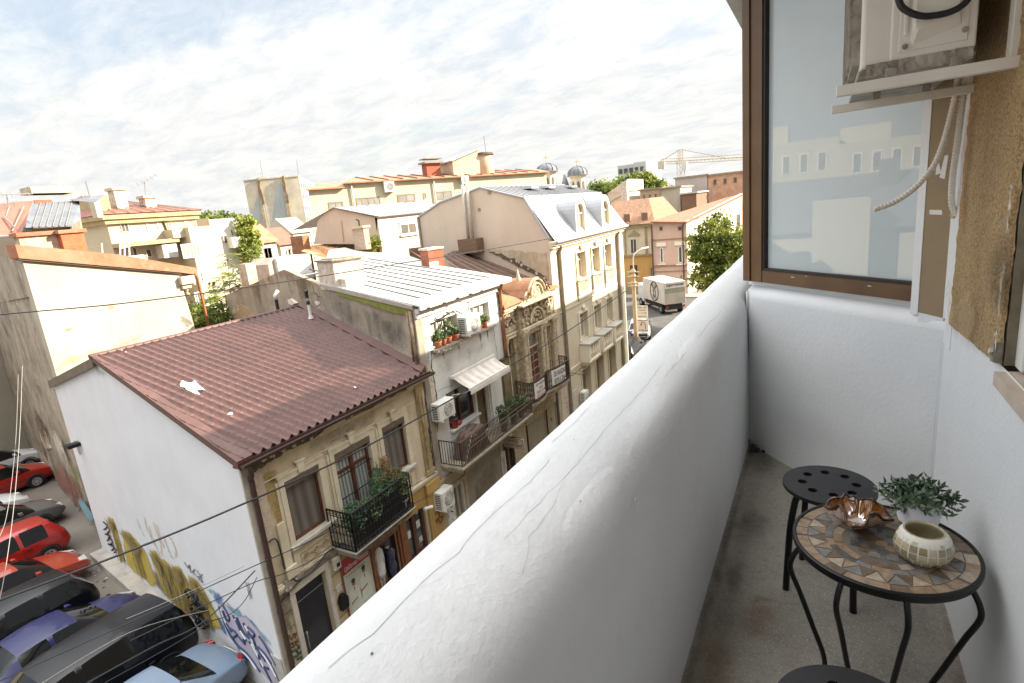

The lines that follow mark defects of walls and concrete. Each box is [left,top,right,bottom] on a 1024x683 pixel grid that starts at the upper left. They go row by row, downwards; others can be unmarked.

crack [328,311,721,668]
spalling [988,327,1004,363]